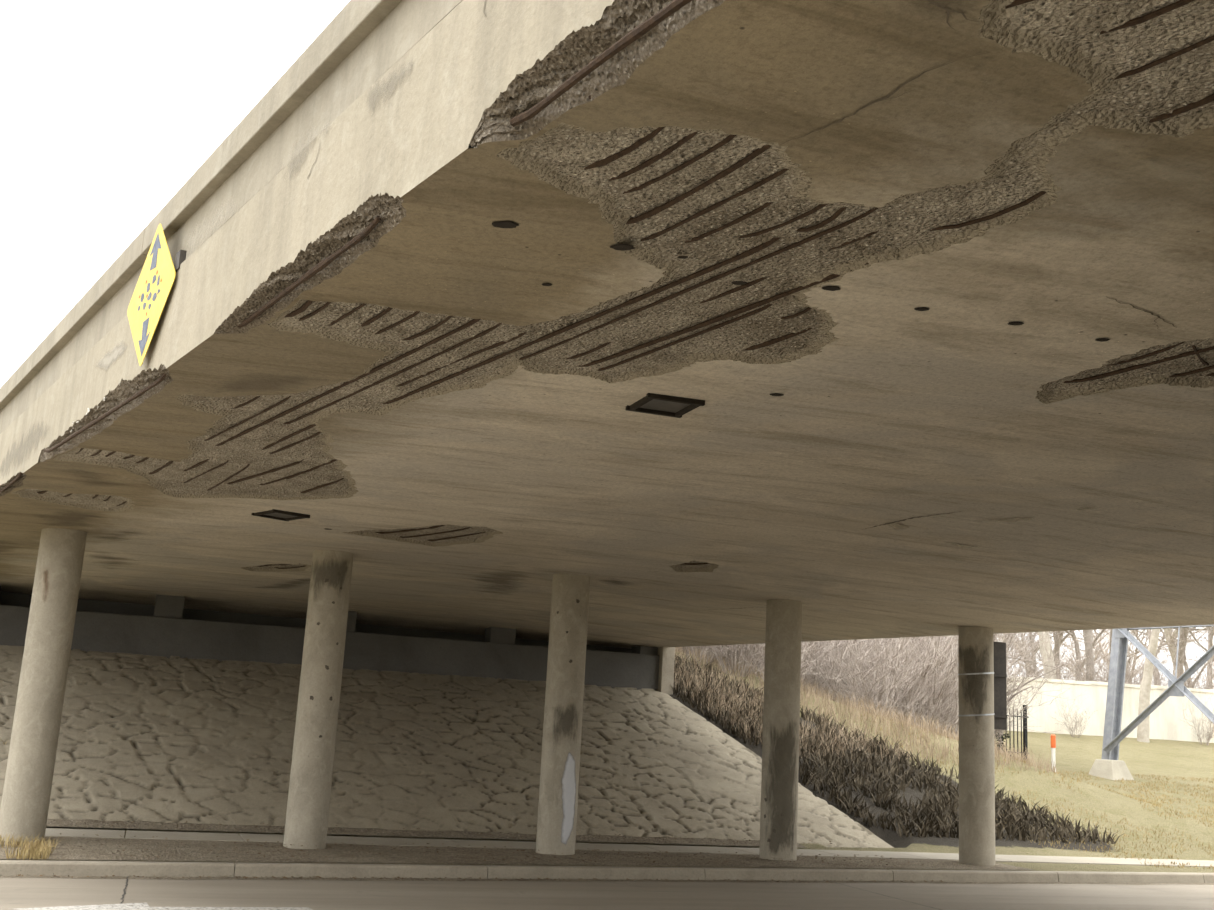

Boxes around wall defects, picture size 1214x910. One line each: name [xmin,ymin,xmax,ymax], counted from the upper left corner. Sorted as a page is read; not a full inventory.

crack [782,53,986,144]
spalling [39,0,1214,500]
spalling [326,524,503,547]